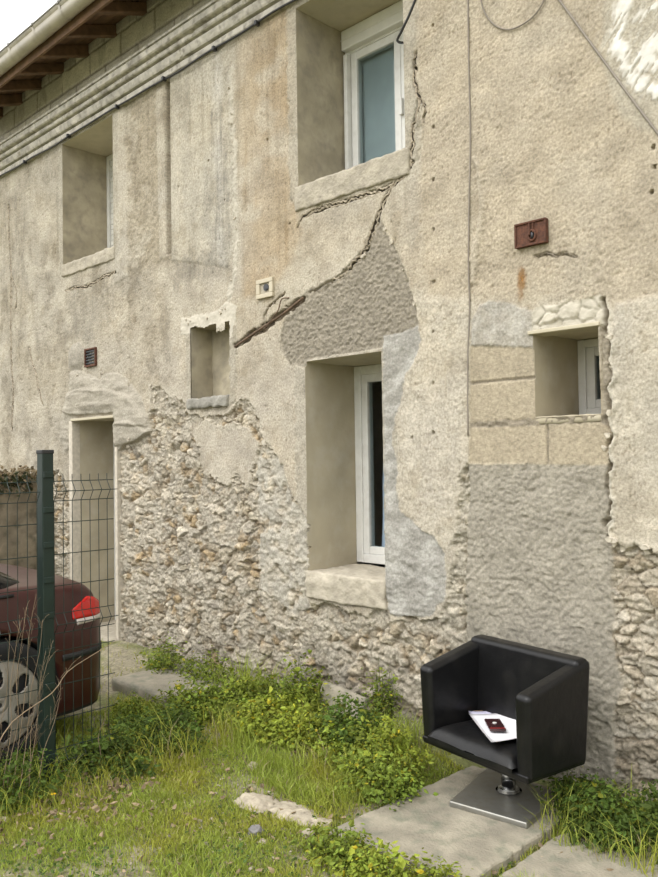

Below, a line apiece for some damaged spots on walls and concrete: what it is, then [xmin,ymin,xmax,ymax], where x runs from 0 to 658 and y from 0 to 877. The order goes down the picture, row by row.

flaking render [281,218,419,367]
crack [297,52,427,296]
spalling [118,384,471,723]
spalling [605,536,658,803]